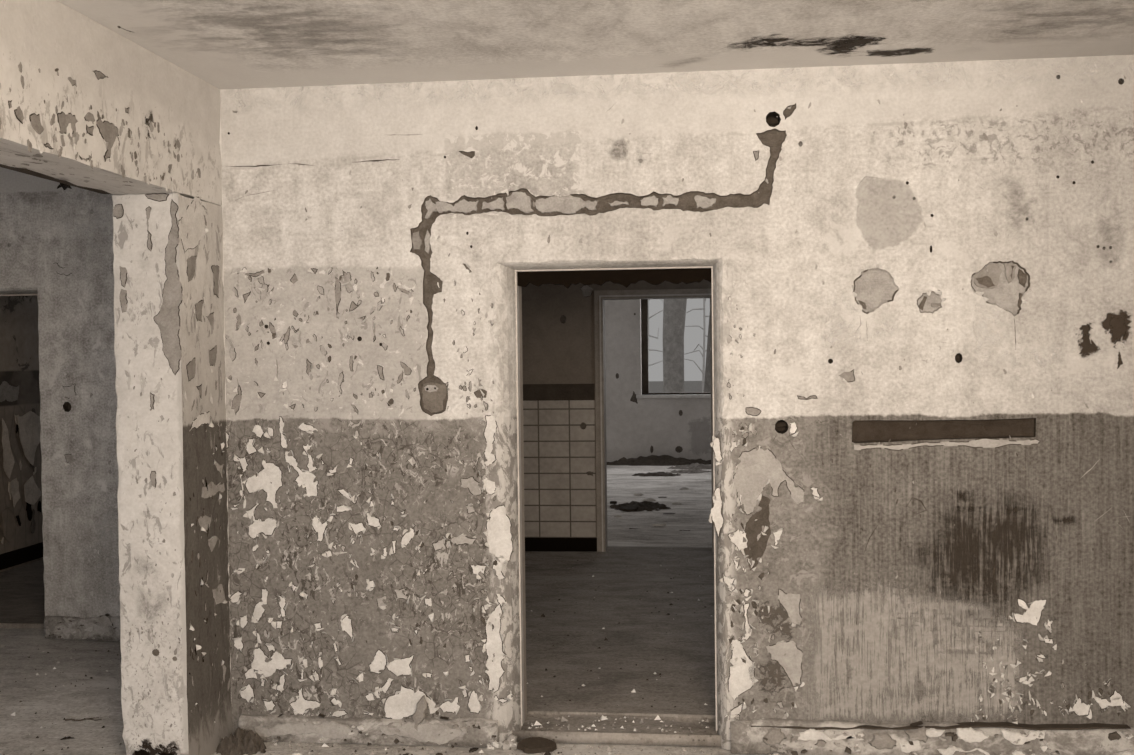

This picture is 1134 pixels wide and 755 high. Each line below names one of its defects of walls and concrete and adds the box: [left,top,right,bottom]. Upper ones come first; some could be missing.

damp [728,34,932,57]
flaking render [851,264,899,314]
flaking render [917,286,947,314]
flaking render [962,258,1030,316]
peeling [0,62,518,752]
peeling [709,379,976,755]
damp [810,492,1074,721]